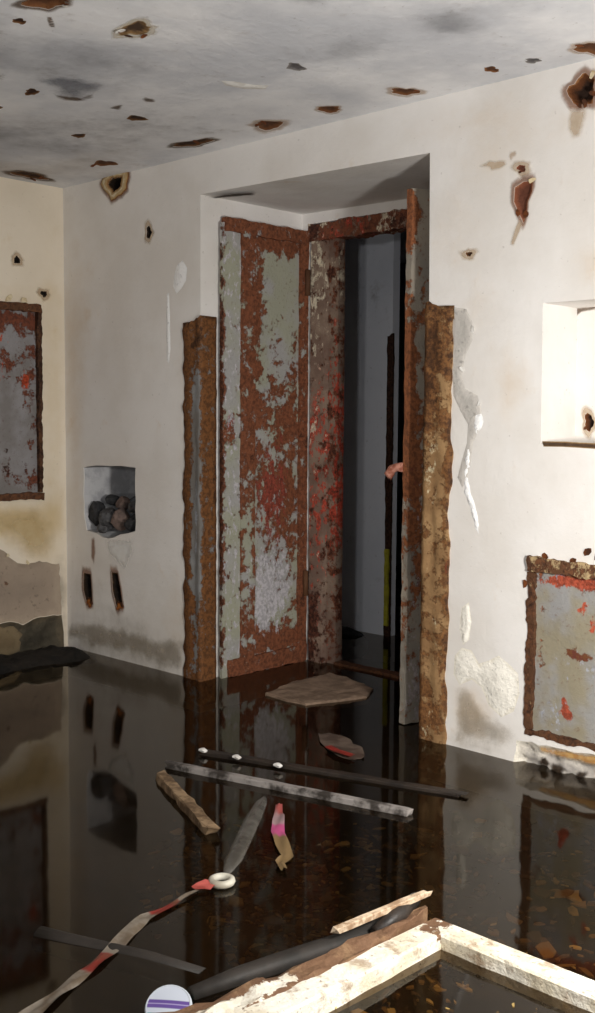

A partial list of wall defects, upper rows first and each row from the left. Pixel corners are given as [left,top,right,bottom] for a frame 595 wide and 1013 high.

spalling [12,0,71,27]
spalling [114,19,156,38]
spalling [573,43,595,55]
spalling [563,69,595,134]
spalling [90,160,130,202]
peeling [452,307,484,533]
peeling [0,549,64,655]
spalling [82,569,93,608]
spalling [110,569,124,612]
damp [454,603,520,717]